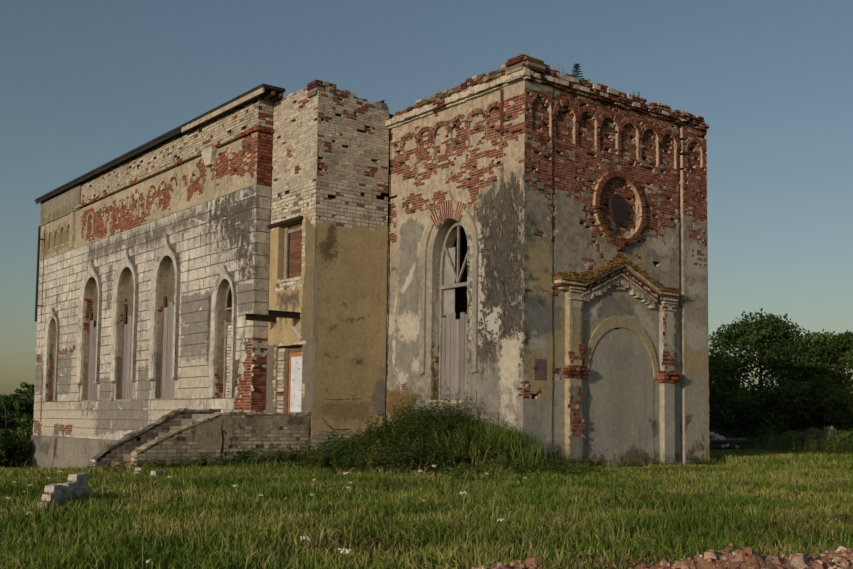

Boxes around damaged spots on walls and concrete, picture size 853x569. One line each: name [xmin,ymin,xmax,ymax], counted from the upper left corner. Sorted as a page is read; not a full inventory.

spalling [83,298,93,333]
spalling [81,132,258,245]
water stain [88,186,257,279]
water stain [319,225,338,260]
water stain [466,164,533,378]
spalling [364,80,708,432]
peeling [33,341,97,437]
peeling [137,348,223,422]
crack [220,420,241,461]
flaking render [187,340,358,460]
peeling [556,385,586,465]
peeling [625,299,710,461]